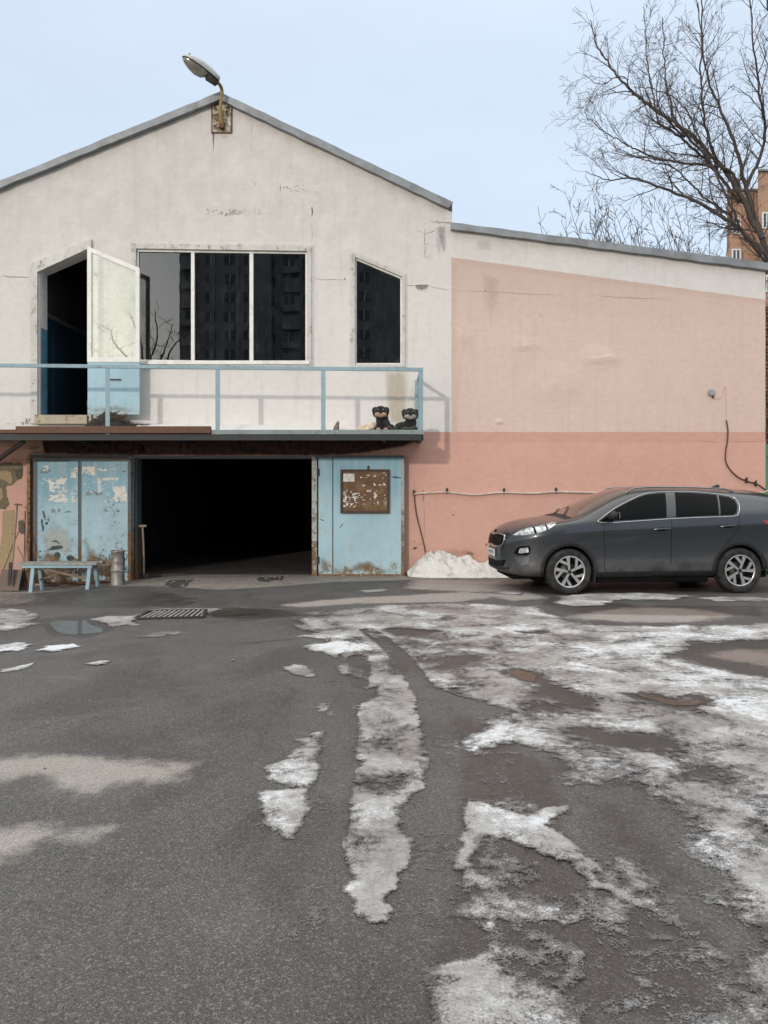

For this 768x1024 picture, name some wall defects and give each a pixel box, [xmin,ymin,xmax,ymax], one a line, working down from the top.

rust [89,553,112,575]